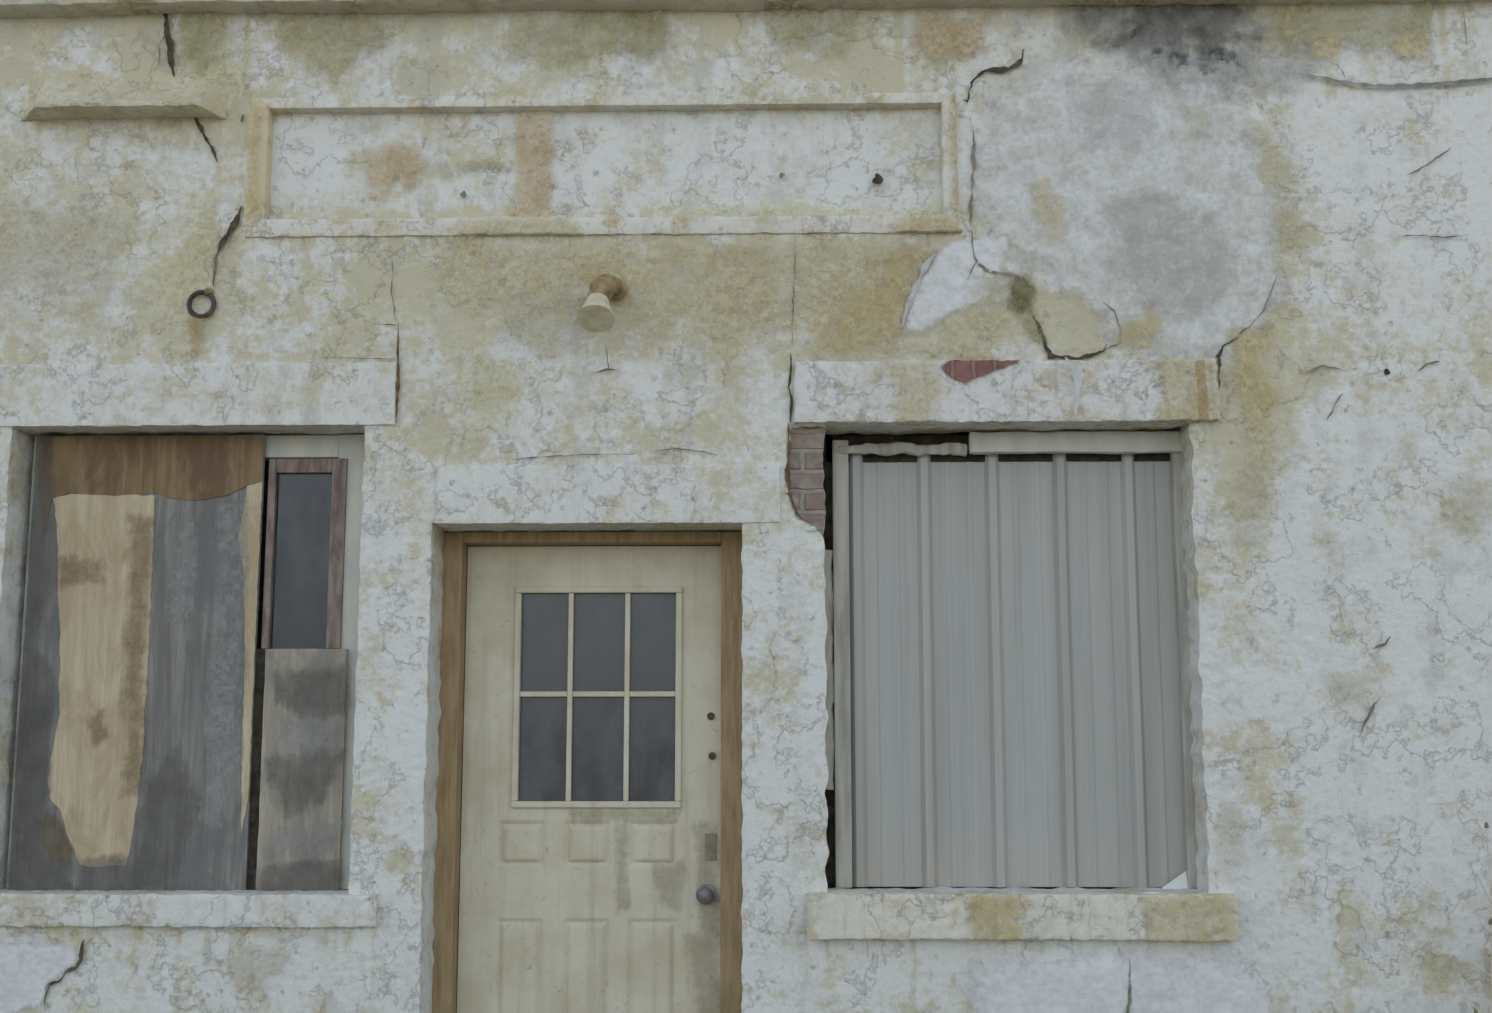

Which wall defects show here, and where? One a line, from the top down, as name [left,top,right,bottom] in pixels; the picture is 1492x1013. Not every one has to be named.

crack [158,13,175,76]
damp [1125,0,1432,96]
crack [194,118,218,162]
crack [212,206,243,287]
crack [964,49,1121,415]
spalling [942,360,1020,382]
crack [1216,276,1277,387]
spalling [784,423,1170,574]
spalling [825,764,836,888]
crack [44,940,84,1005]
crack [1125,960,1133,1013]